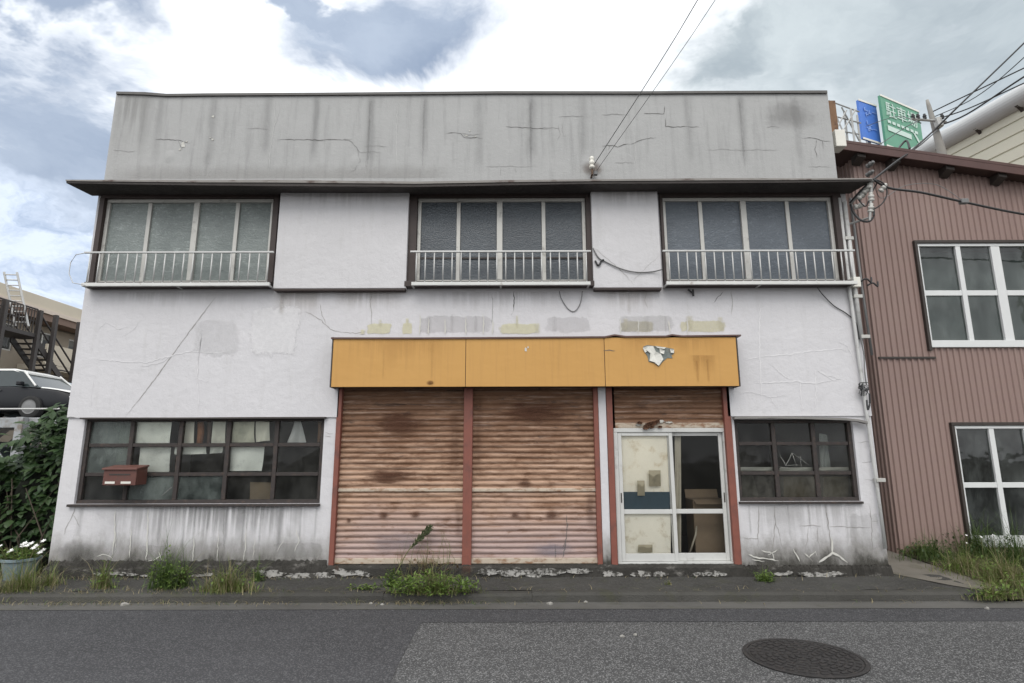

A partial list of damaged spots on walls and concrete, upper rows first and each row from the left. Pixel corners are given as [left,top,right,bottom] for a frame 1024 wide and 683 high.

crack [506,107,697,163]
crack [309,299,372,334]
peeling [621,319,653,332]
peeling [680,316,725,332]
crack [130,302,212,411]
corrosion [638,420,662,430]
corrosion [371,470,403,483]
crack [746,506,873,553]
spalling [256,567,371,578]
spalling [477,568,669,577]